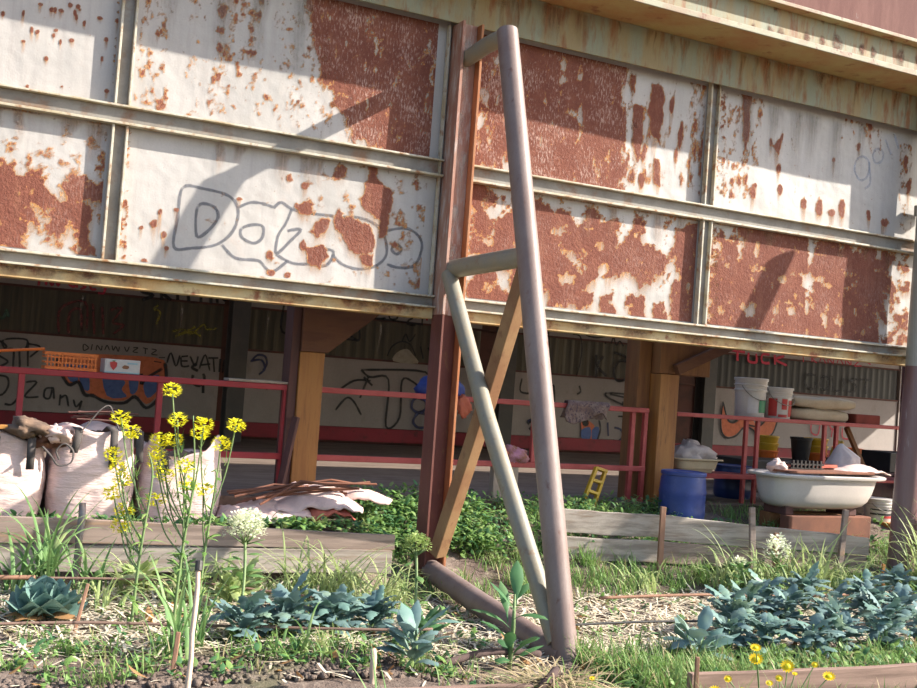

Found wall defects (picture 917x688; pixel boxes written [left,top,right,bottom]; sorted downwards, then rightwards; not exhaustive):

corrosion [0,136,106,256]
corrosion [135,48,168,110]
corrosion [196,0,266,115]
corrosion [254,0,439,157]
corrosion [287,166,425,289]
corrosion [474,50,508,170]
corrosion [468,183,516,256]
corrosion [519,43,707,195]
corrosion [534,194,698,322]
corrosion [717,94,764,200]
corrosion [707,223,910,345]
corrosion [801,197,845,219]